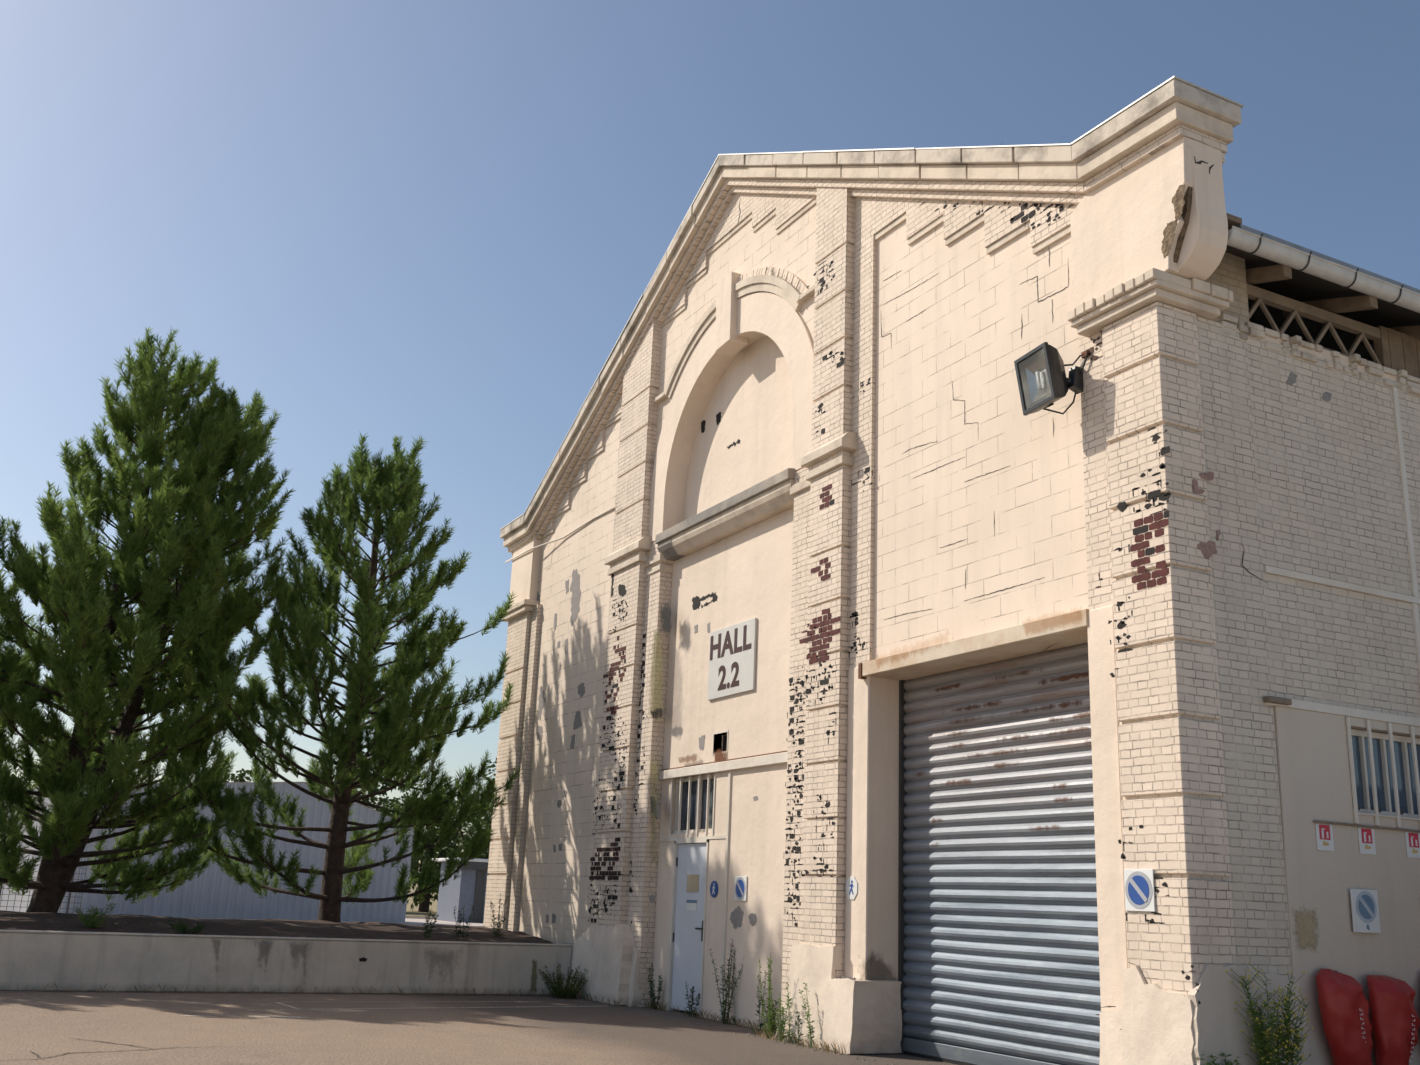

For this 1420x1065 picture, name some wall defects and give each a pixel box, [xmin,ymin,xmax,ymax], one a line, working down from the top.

flaking render [921,201,1073,230]
spalling [1161,185,1185,258]
crack [879,270,937,337]
crack [1019,251,1069,338]
crack [904,386,1009,482]
spalling [1192,471,1214,494]
crack [940,521,1045,601]
flaking render [1108,427,1171,678]
flaking render [554,569,581,654]
flaking render [570,683,585,749]
flaking render [588,574,661,923]
peeling [784,608,871,927]